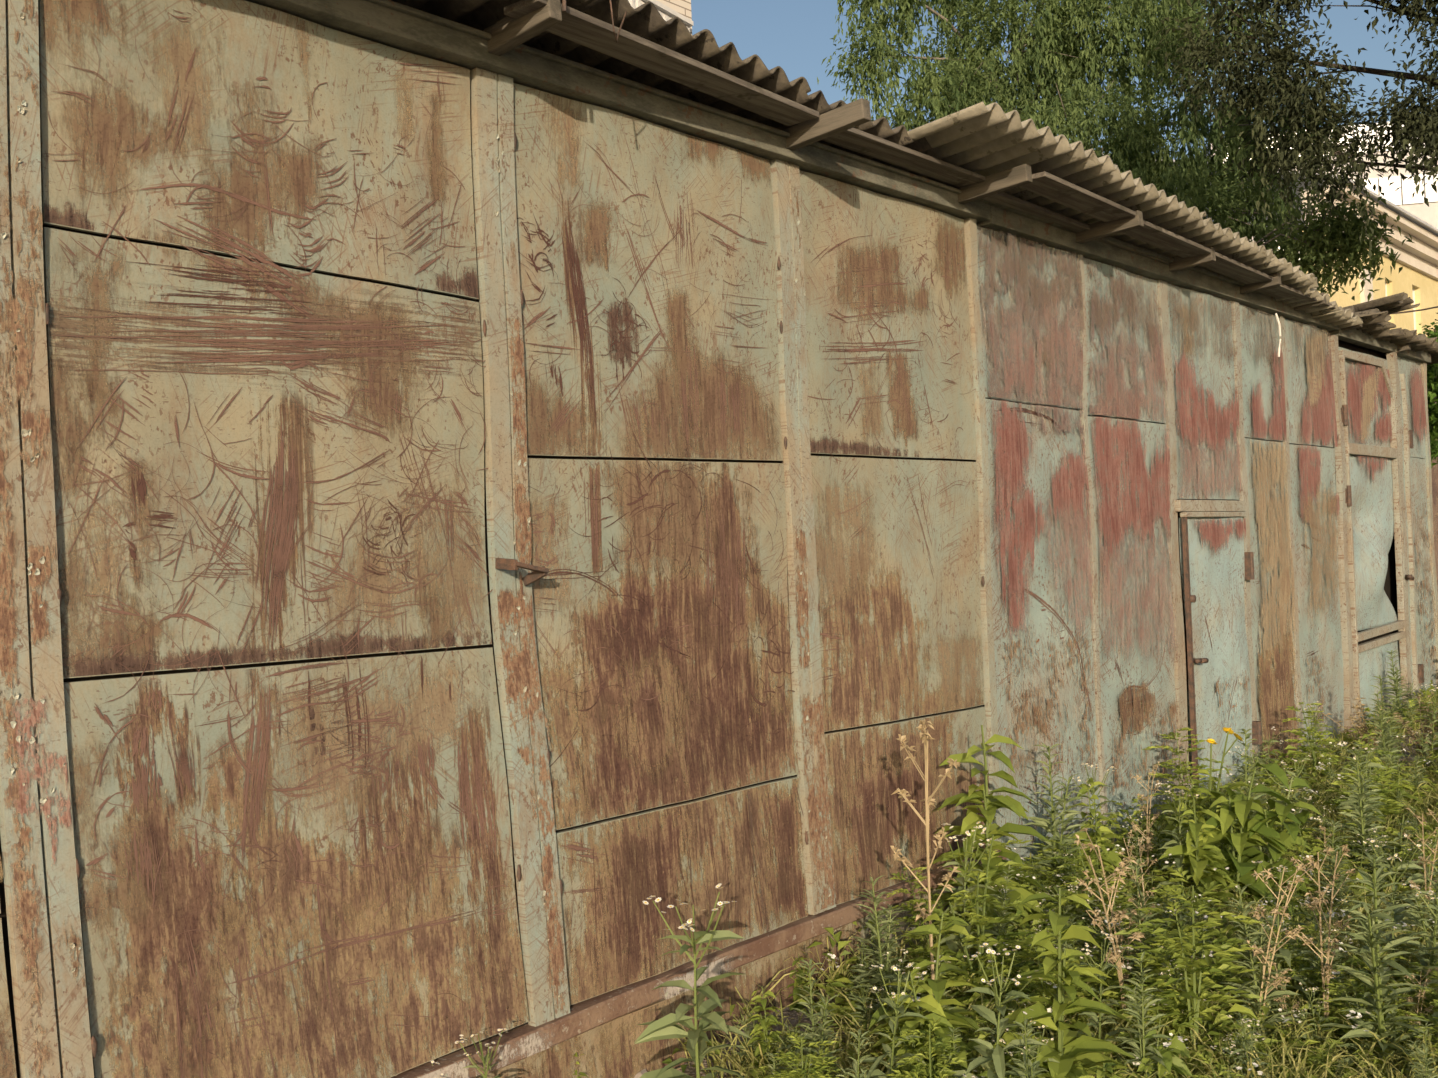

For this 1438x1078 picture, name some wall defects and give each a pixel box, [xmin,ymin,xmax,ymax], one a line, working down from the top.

corrosion [44,26,220,230]
corrosion [280,143,323,219]
corrosion [397,76,447,203]
corrosion [687,135,770,180]
corrosion [837,220,965,321]
corrosion [811,351,919,457]
peeling [979,228,1392,796]
corrosion [525,200,808,1004]
corrosion [60,399,528,1078]
corrosion [815,484,989,905]
corrosion [1118,681,1156,736]
corrosion [494,921,875,1078]